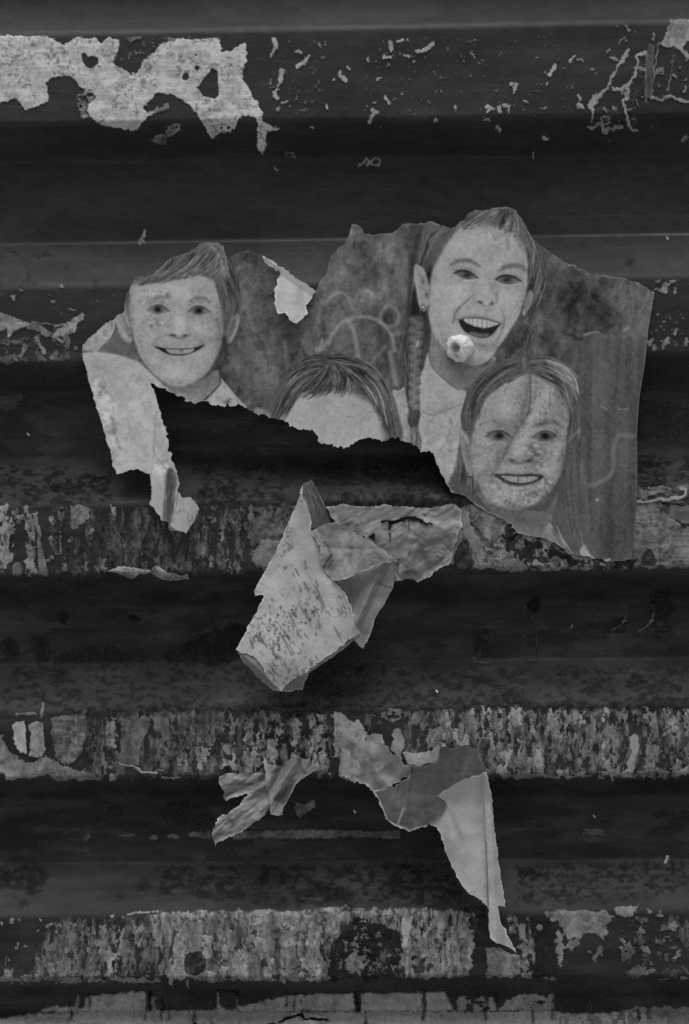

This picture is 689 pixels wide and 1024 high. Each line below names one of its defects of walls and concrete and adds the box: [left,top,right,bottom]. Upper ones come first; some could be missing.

peeling [0,34,326,155]
peeling [480,19,689,141]
peeling [70,504,90,529]
peeling [109,566,189,581]
peeling [12,702,46,758]
spalling [328,917,403,983]
peeling [543,930,603,980]
peeling [618,909,688,980]